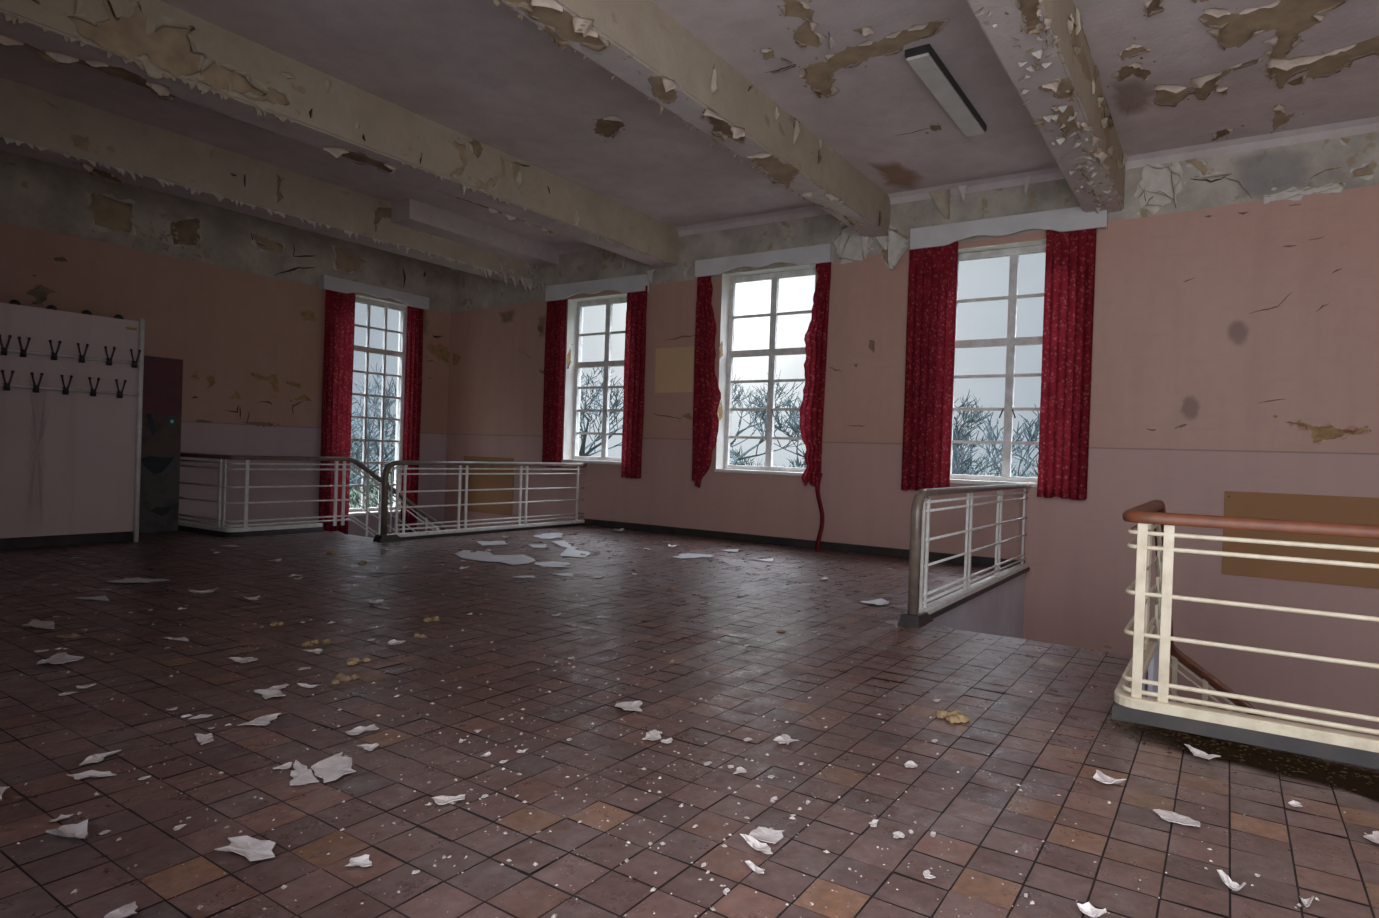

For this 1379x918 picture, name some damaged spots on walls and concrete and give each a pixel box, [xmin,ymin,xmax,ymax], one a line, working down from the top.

peeling [777,0,950,98]
peeling [975,0,1379,215]
crack [1249,268,1342,314]
peeling [1273,415,1371,445]